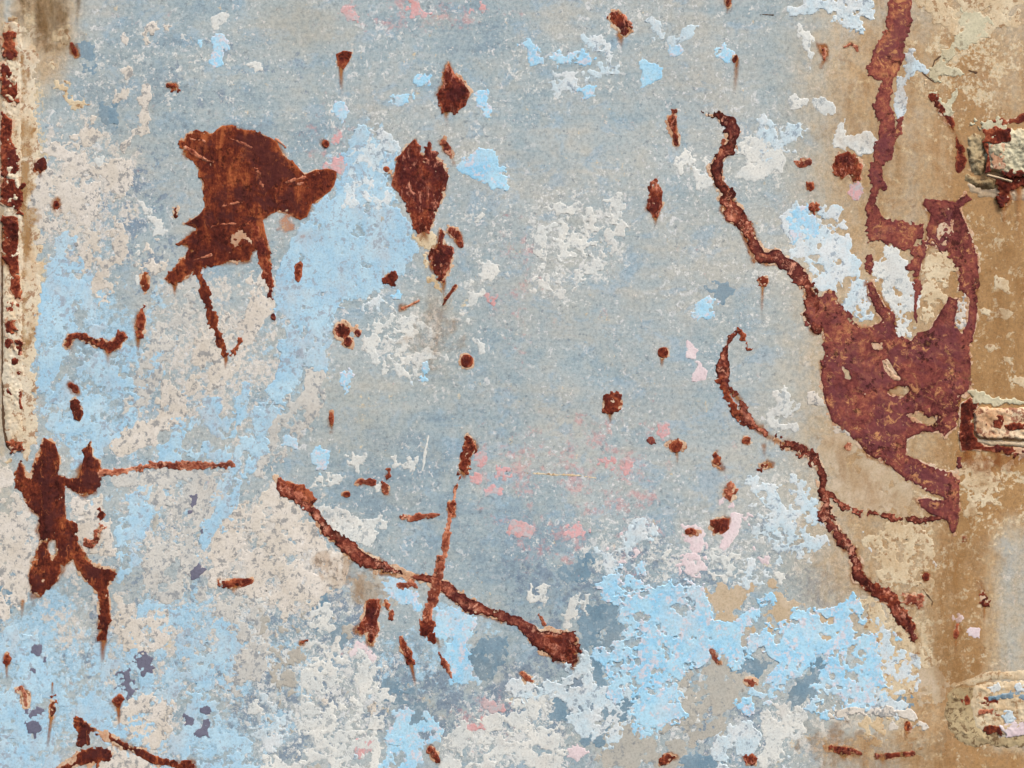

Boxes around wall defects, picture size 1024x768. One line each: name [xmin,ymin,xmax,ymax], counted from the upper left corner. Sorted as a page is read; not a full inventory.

rust [0,30,47,303]
rust [164,125,337,364]
rust [382,135,464,289]
rust [436,61,474,116]
peeling [517,33,620,102]
peeling [734,93,878,182]
peeling [779,200,967,338]
rust [800,0,1024,543]
peeling [0,12,449,768]
rust [6,438,236,656]
peeling [433,512,950,768]
peeling [744,473,830,567]